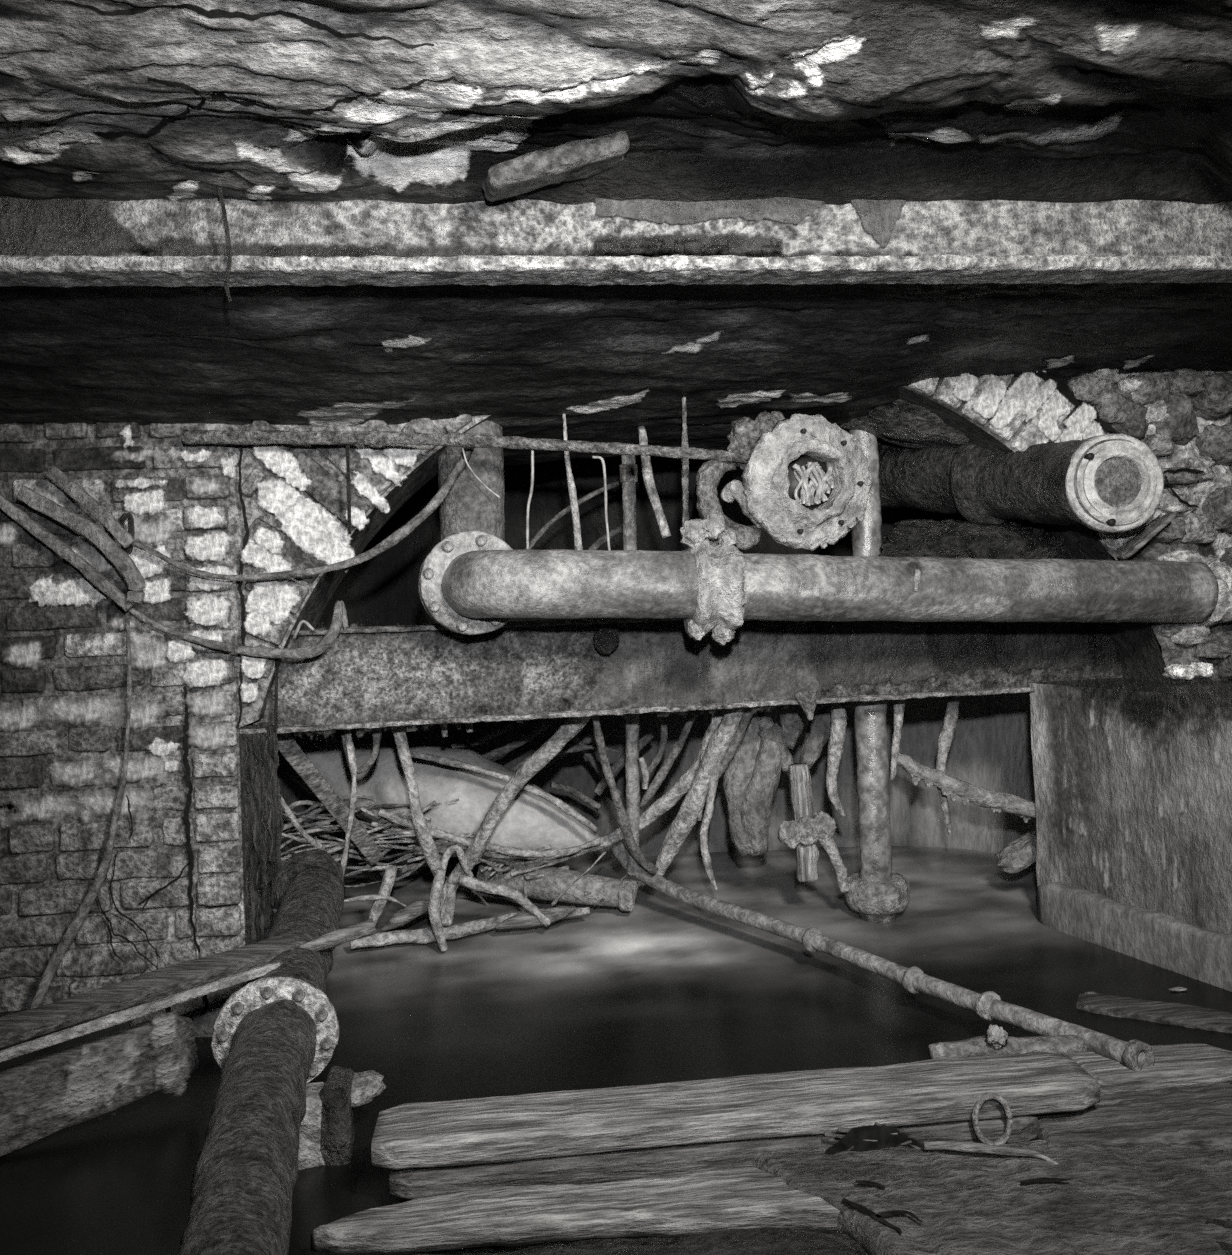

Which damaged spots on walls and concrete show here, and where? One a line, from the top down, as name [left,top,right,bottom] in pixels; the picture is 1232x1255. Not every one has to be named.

crack [45,0,434,48]
crack [0,114,59,132]
crack [90,75,456,190]
crack [237,445,249,728]
rust [591,566,1025,720]
rust [988,566,1191,674]
leakage [0,695,164,730]
leakage [0,754,177,825]